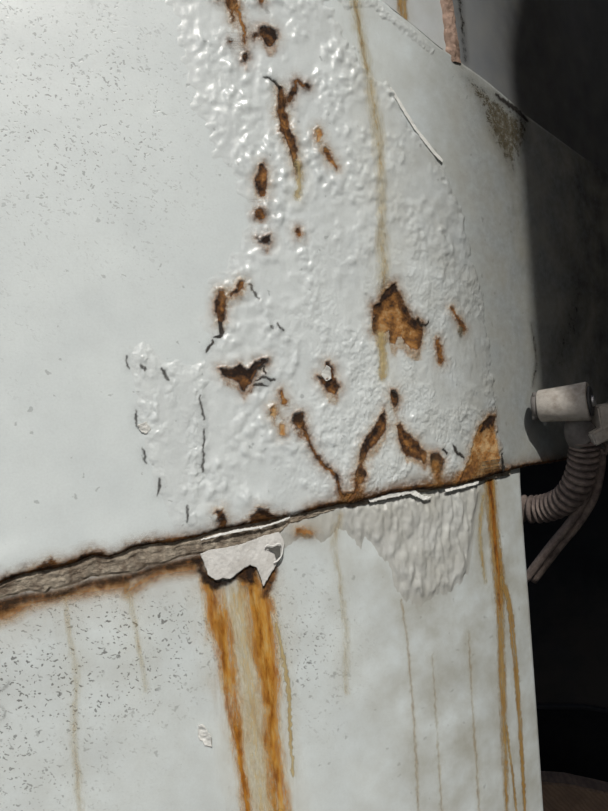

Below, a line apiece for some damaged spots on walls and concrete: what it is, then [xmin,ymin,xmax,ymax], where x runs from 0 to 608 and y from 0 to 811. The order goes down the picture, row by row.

corrosion [225,0,279,63]
corrosion [264,76,312,198]
corrosion [254,162,268,197]
corrosion [206,280,244,353]
corrosion [372,282,429,380]
corrosion [218,358,275,399]
peeling [368,490,432,503]
peeling [445,481,479,492]
corrosion [0,507,288,583]
peeling [200,517,290,586]
corrosion [301,415,568,811]
corrosion [0,555,294,811]